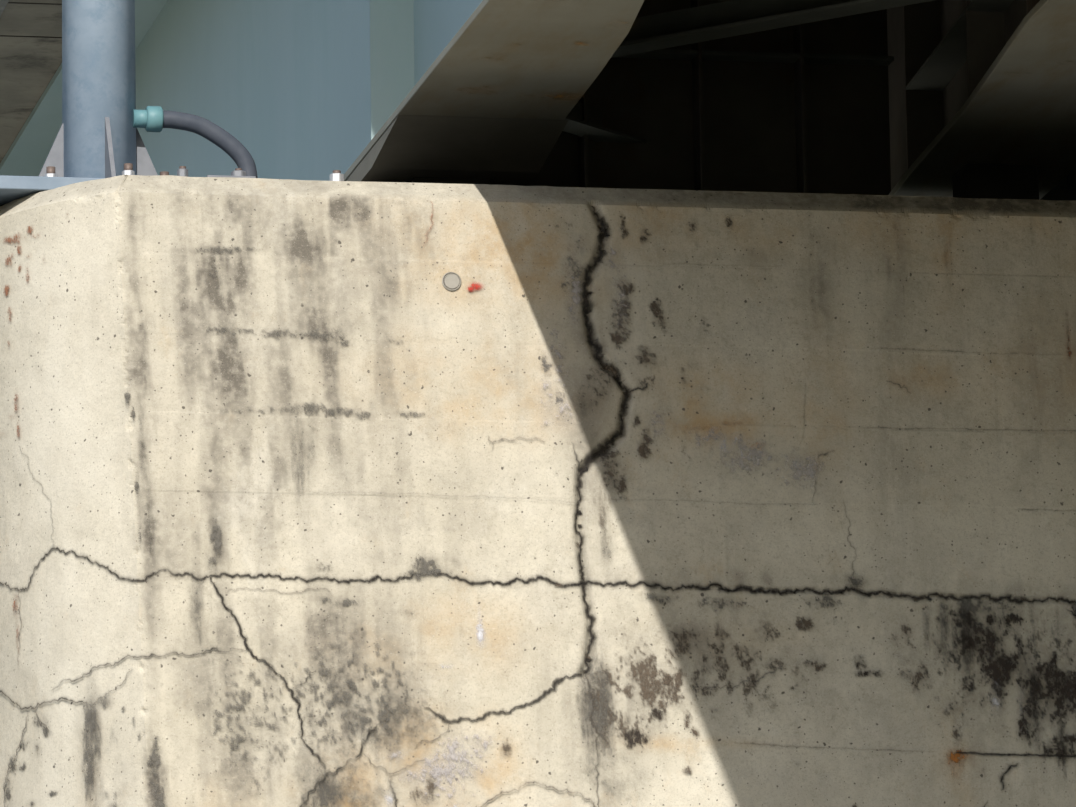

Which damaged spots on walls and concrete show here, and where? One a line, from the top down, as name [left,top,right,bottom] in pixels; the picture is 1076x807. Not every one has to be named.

leakage [308,330,348,346]
leakage [304,403,370,419]
crack [0,206,1076,807]
mould [796,617,813,631]
mould [582,629,782,748]
leakage [907,666,941,689]
leakage [926,600,1076,766]